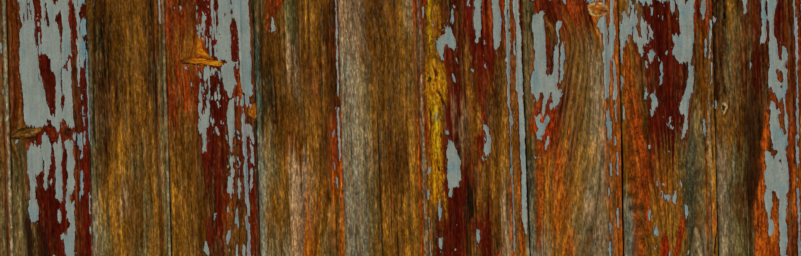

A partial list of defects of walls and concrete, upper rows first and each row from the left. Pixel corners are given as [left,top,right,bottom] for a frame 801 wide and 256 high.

peeling [17,0,91,256]
peeling [184,0,256,256]
peeling [428,131,461,256]
peeling [435,5,458,64]
peeling [467,0,565,252]
peeling [587,0,716,196]
peeling [656,180,688,219]
peeling [760,0,801,256]